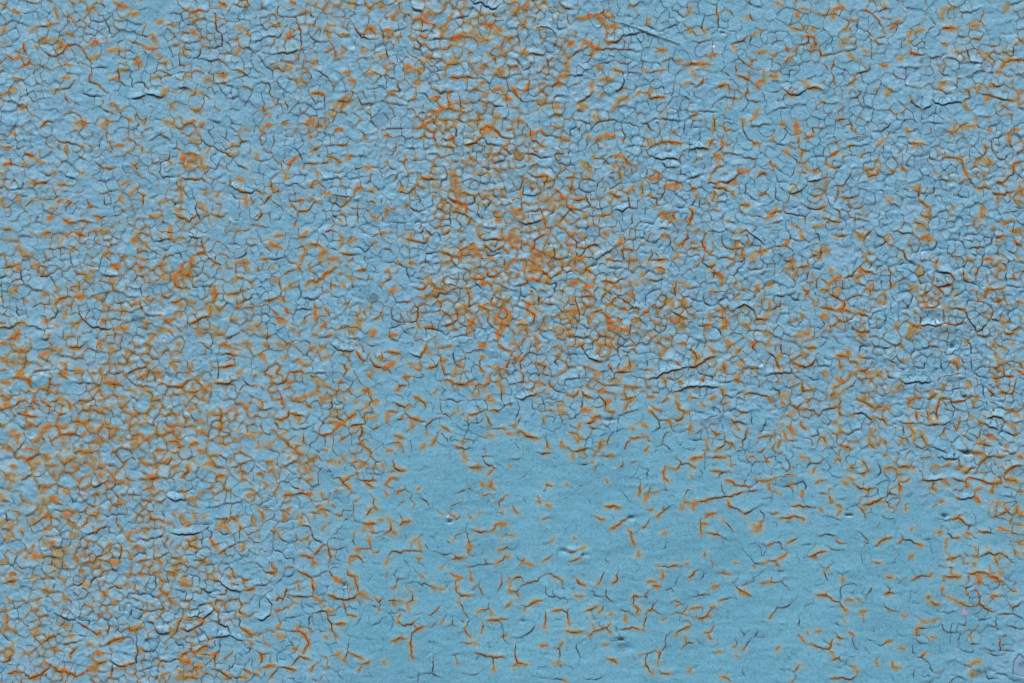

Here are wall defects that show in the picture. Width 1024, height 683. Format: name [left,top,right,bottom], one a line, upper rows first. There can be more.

rust [284,1,820,467]
rust [771,121,966,347]
rust [942,145,1024,205]
rust [965,246,1024,395]
rust [0,108,435,681]
rust [900,359,1024,554]
crack [373,550,430,655]
crack [443,486,547,568]
crack [452,539,795,675]
crack [813,623,856,680]
crack [861,533,932,611]
crack [935,570,1021,656]